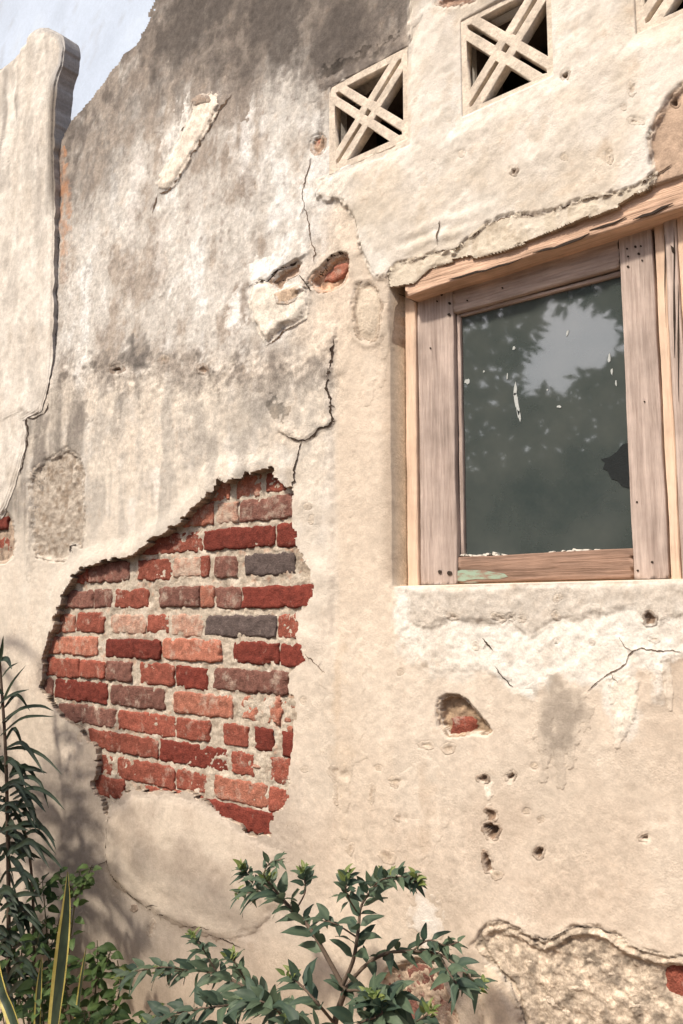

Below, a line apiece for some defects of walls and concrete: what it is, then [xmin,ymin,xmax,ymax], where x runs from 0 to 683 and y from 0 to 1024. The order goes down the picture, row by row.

damp [119,0,431,298]
crack [249,158,349,292]
crack [19,289,58,472]
damp [185,331,335,492]
peeling [248,253,350,346]
crack [287,339,335,486]
damp [342,249,406,407]
flaking render [38,466,314,838]
flaking render [417,694,493,755]
damp [524,671,595,790]
crack [589,638,680,690]
spalling [475,920,683,1024]